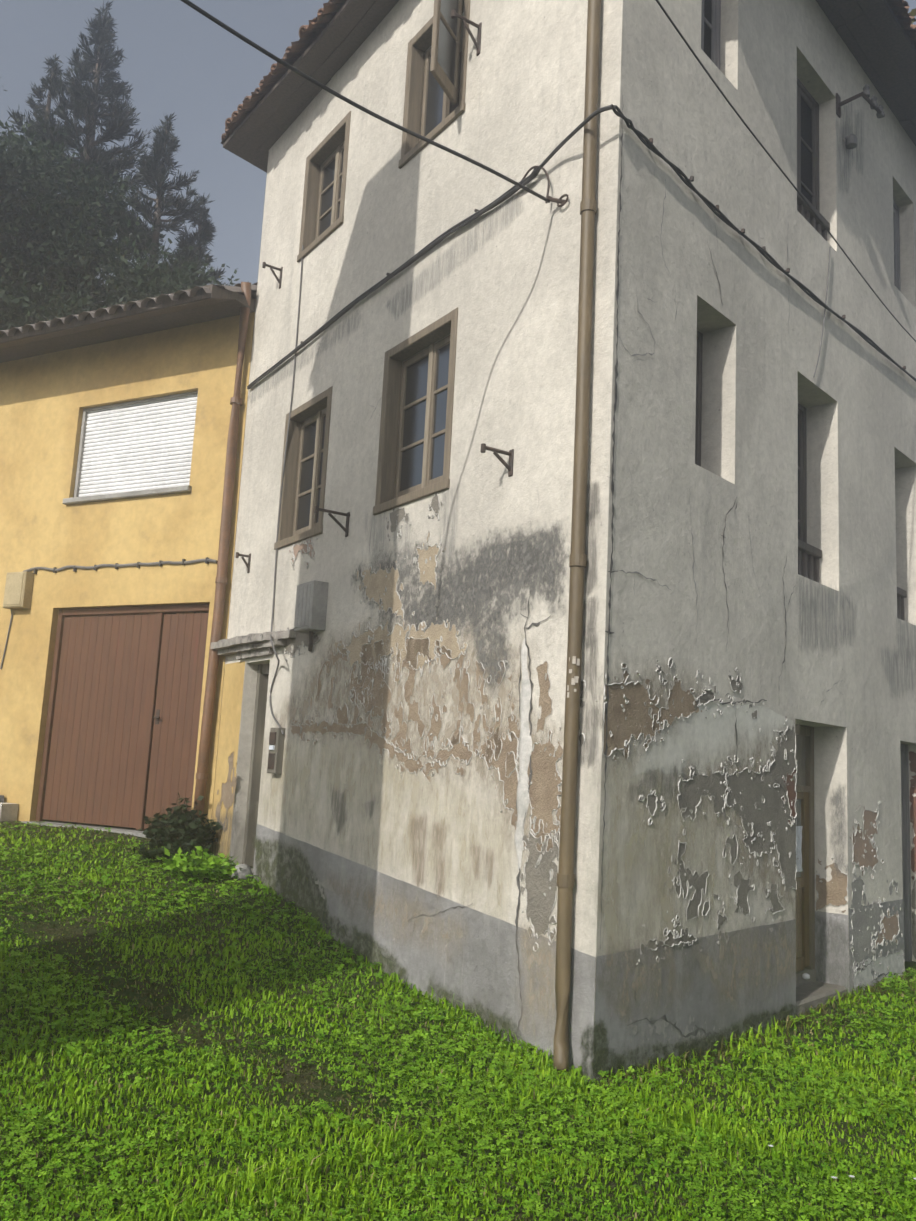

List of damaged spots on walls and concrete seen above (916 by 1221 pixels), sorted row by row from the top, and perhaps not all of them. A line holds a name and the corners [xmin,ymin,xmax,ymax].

peeling [280,492,563,952]
leakage [282,527,565,813]
peeling [567,656,797,965]
crack [600,98,797,949]
peeling [815,751,916,995]